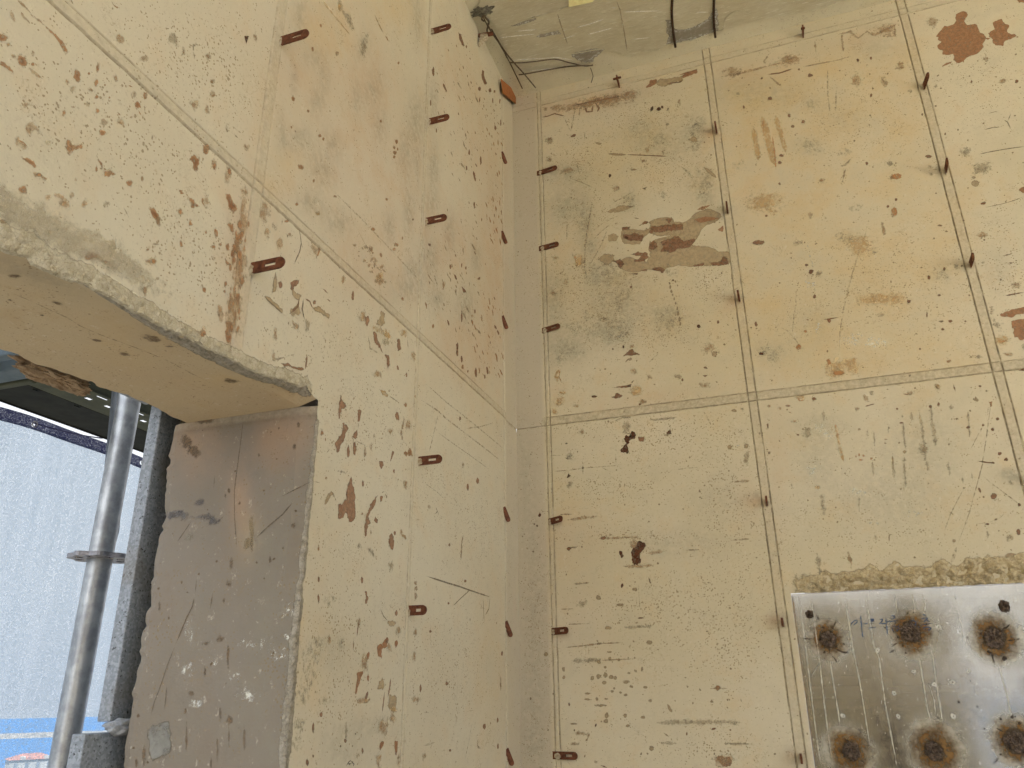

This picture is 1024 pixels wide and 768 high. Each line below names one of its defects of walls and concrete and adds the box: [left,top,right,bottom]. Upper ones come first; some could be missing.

peeling [930,11,1018,67]
spalling [0,222,312,396]
corrosion [205,189,249,351]
peeling [265,273,330,329]
peeling [598,205,731,325]
peeling [991,307,1024,356]
peeling [325,478,383,536]
spalling [278,397,372,768]
spalling [793,529,1024,593]